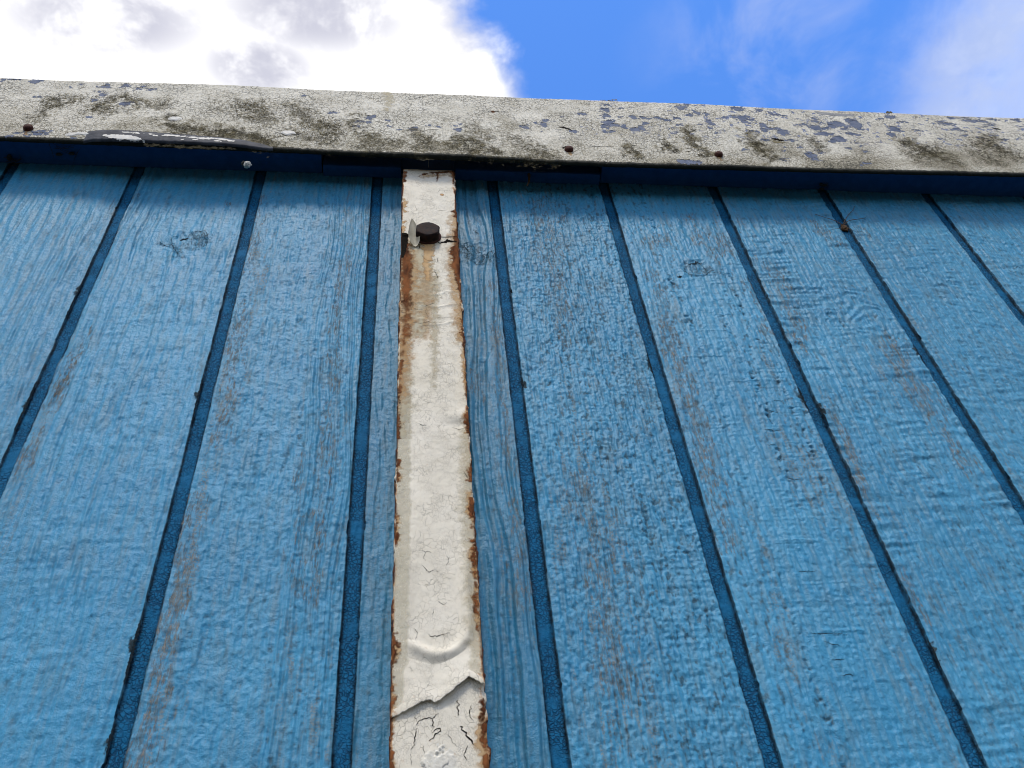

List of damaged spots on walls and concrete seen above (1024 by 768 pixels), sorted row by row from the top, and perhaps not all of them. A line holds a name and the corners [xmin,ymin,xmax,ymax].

leakage [29,91,400,153]
leakage [409,125,558,163]
leakage [656,125,715,160]
leakage [738,130,784,165]
leakage [892,135,1023,168]
corrosion [397,198,435,439]
corrosion [448,210,470,436]
corrosion [465,466,480,631]
corrosion [390,633,401,737]
crack [411,700,473,763]
corrosion [474,698,489,768]